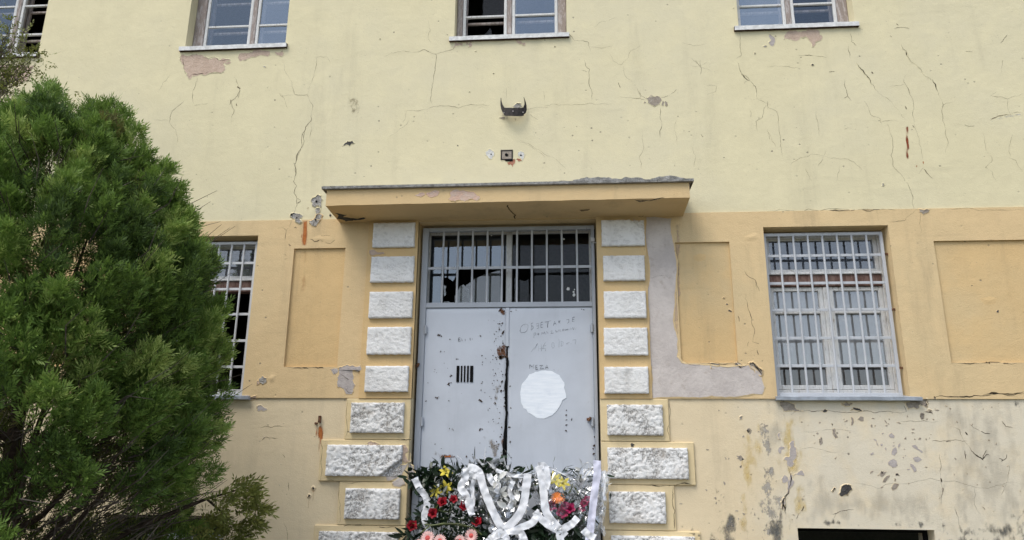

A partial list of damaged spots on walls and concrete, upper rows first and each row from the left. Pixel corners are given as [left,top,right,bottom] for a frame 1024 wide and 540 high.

peeling [754,29,823,55]
peeling [179,49,285,80]
spalling [644,95,668,107]
crack [737,24,951,222]
spalling [290,194,323,227]
peeling [330,364,362,395]
leakage [759,424,782,535]
peeling [738,415,805,521]
spalling [831,483,853,497]
peeling [779,398,951,491]
crack [781,392,1022,526]